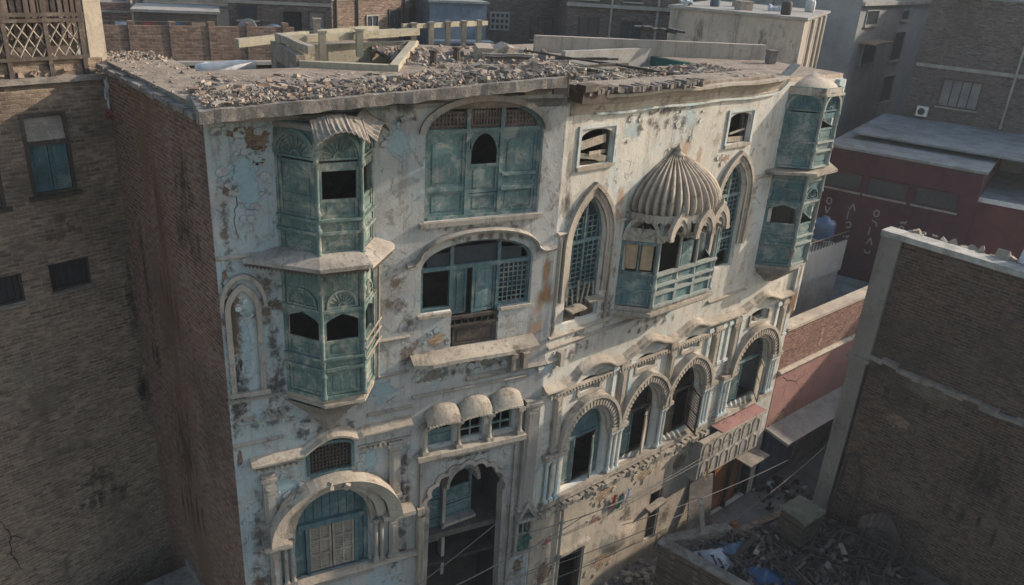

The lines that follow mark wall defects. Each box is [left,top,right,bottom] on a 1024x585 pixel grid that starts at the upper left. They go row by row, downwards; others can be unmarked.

peeling [210,122,273,223]
damp [253,276,283,356]
rust [539,260,552,302]
damp [221,294,256,437]
damp [267,370,322,440]
flaking render [412,367,449,383]
crack [0,521,24,570]